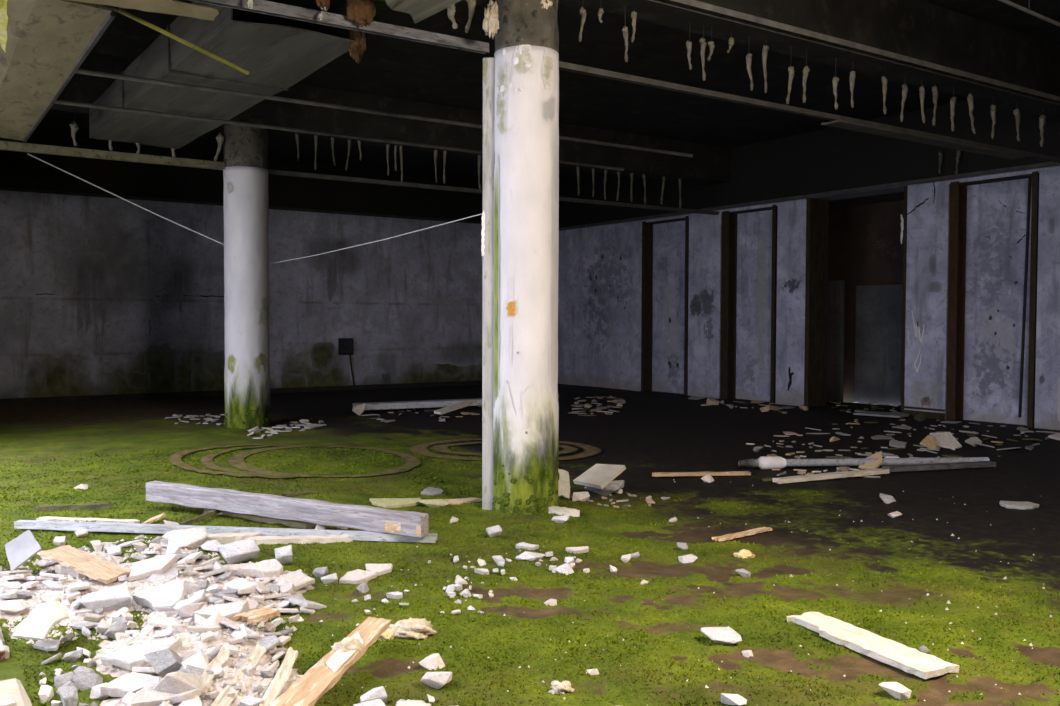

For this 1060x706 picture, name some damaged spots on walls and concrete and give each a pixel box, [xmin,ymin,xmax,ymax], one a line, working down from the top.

peeling [496,44,556,126]
corrosion [505,275,518,364]